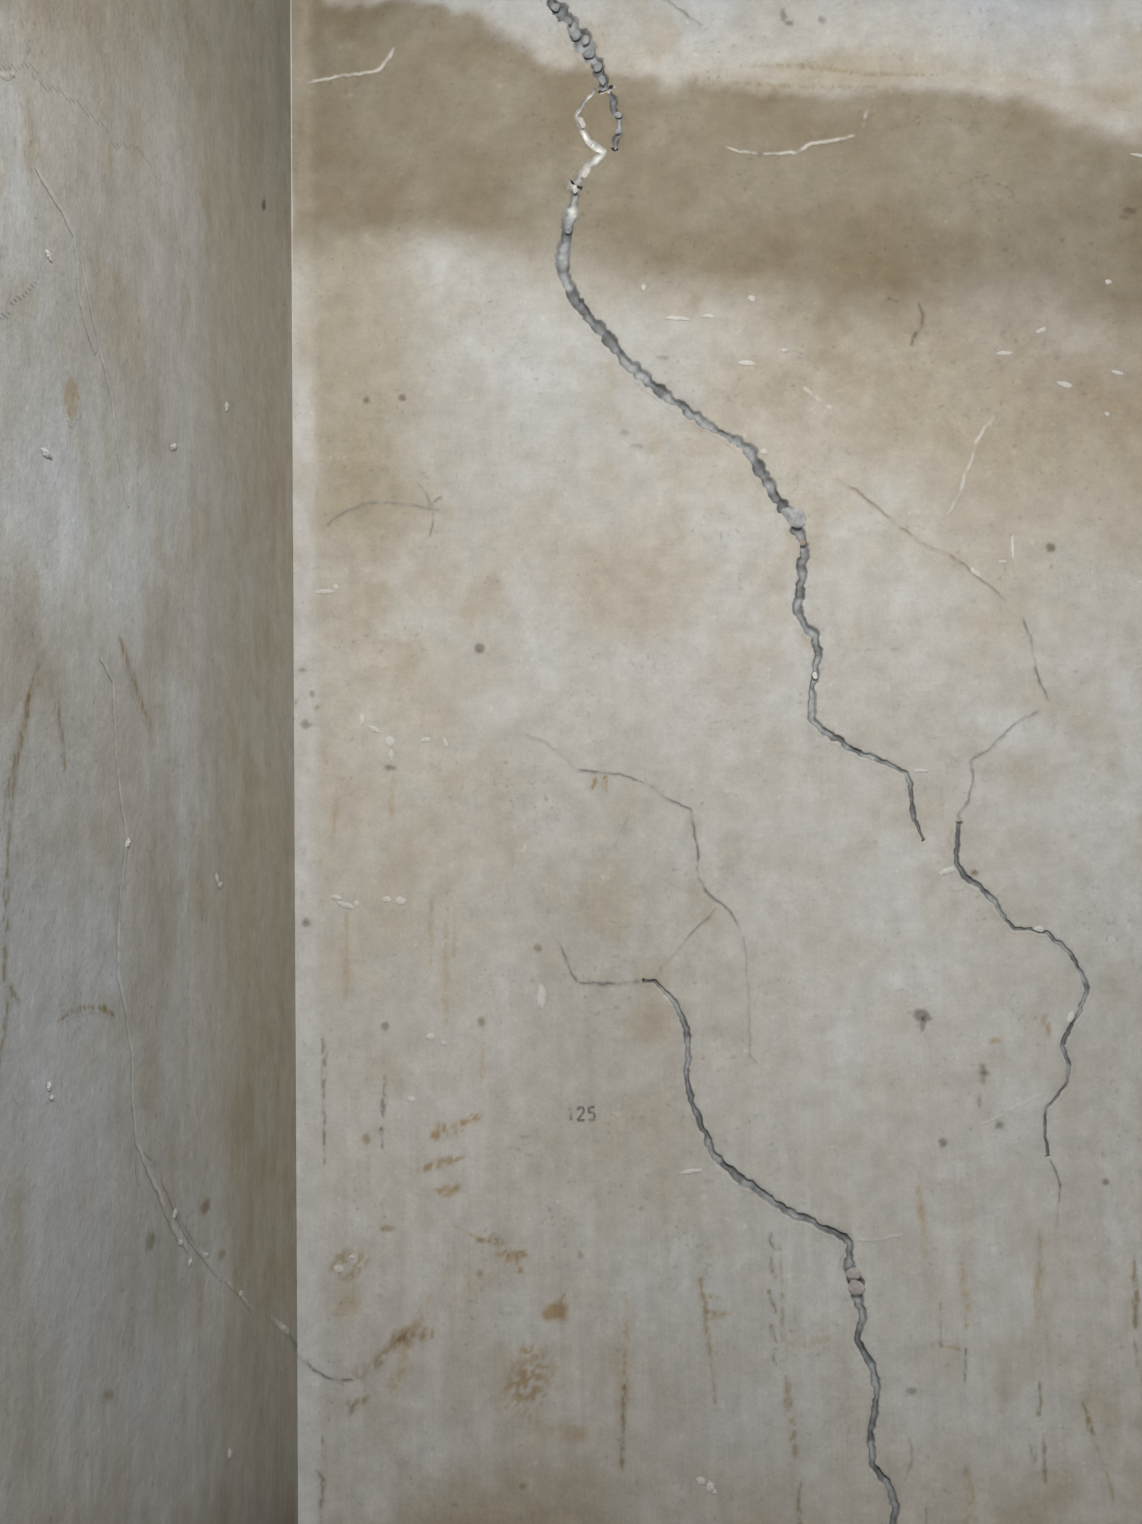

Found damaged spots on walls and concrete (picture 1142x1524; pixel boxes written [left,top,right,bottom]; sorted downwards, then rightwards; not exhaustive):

crack [306,45,396,85]
crack [325,480,443,538]
leakage [291,0,1142,599]
crack [541,0,1093,1229]
crack [520,731,905,1524]